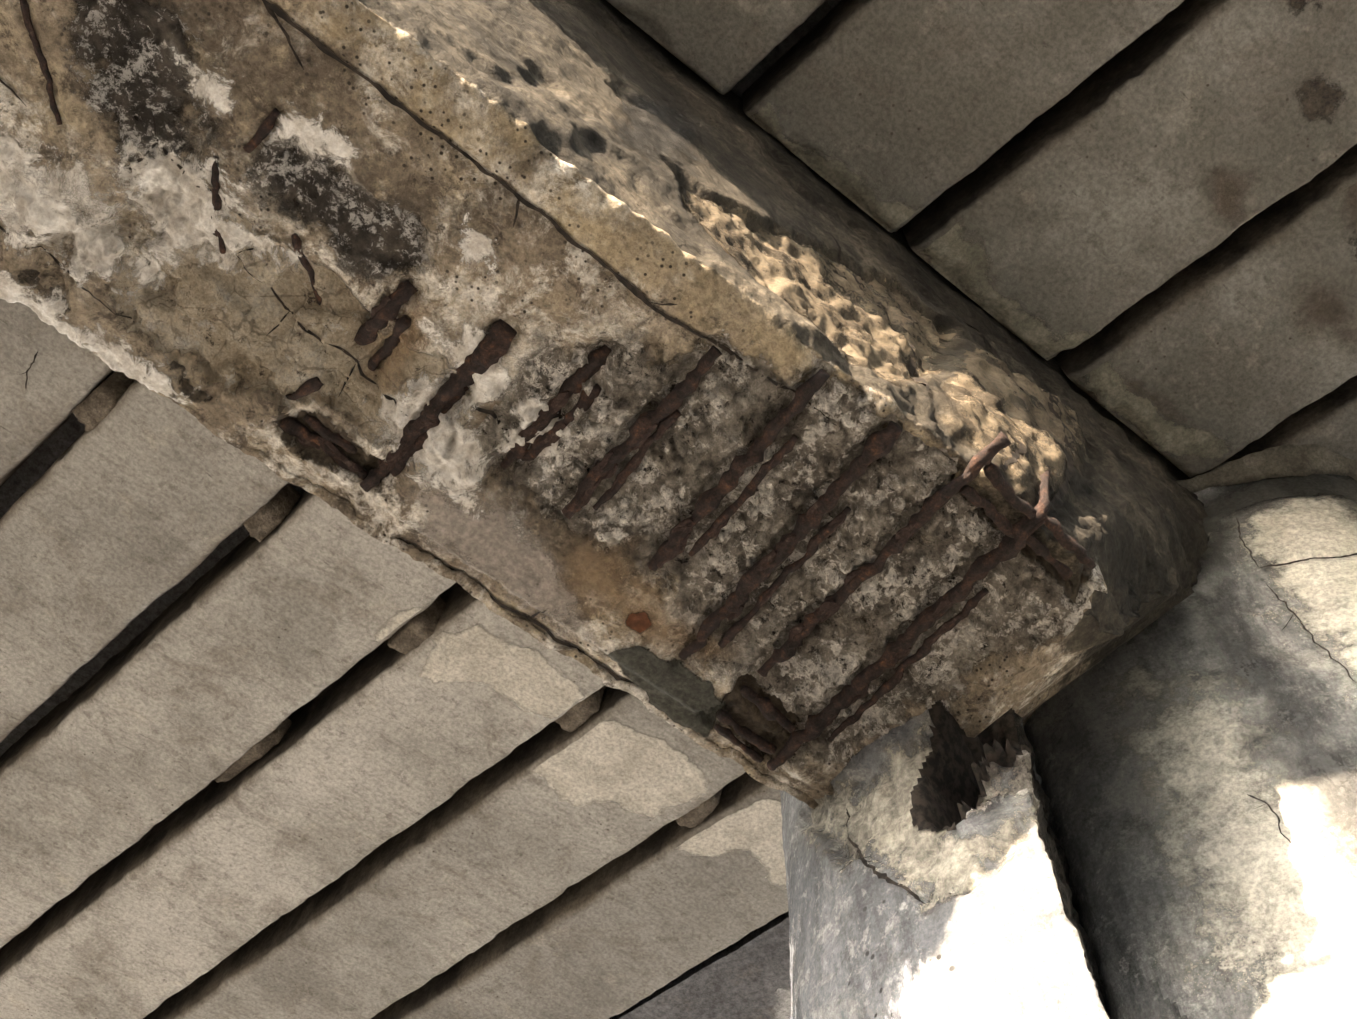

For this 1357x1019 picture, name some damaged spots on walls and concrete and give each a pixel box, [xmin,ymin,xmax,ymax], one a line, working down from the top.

spalling [19,0,62,125]
spalling [18,269,71,315]
water stain [0,124,301,404]
water stain [163,41,236,117]
crack [116,112,407,416]
water stain [276,106,358,169]
crack [262,0,844,430]
water stain [364,316,577,623]
spalling [63,0,1108,914]
corrosion [625,612,653,634]
crack [1237,519,1357,681]
crack [838,809,925,904]